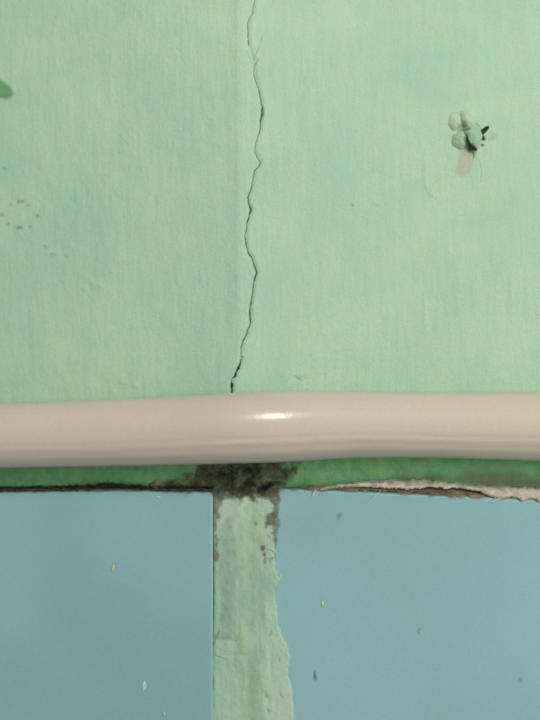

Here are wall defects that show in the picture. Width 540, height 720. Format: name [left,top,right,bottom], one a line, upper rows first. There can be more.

crack [230,92,266,393]
water stain [164,462,297,543]
flaking render [311,479,540,503]